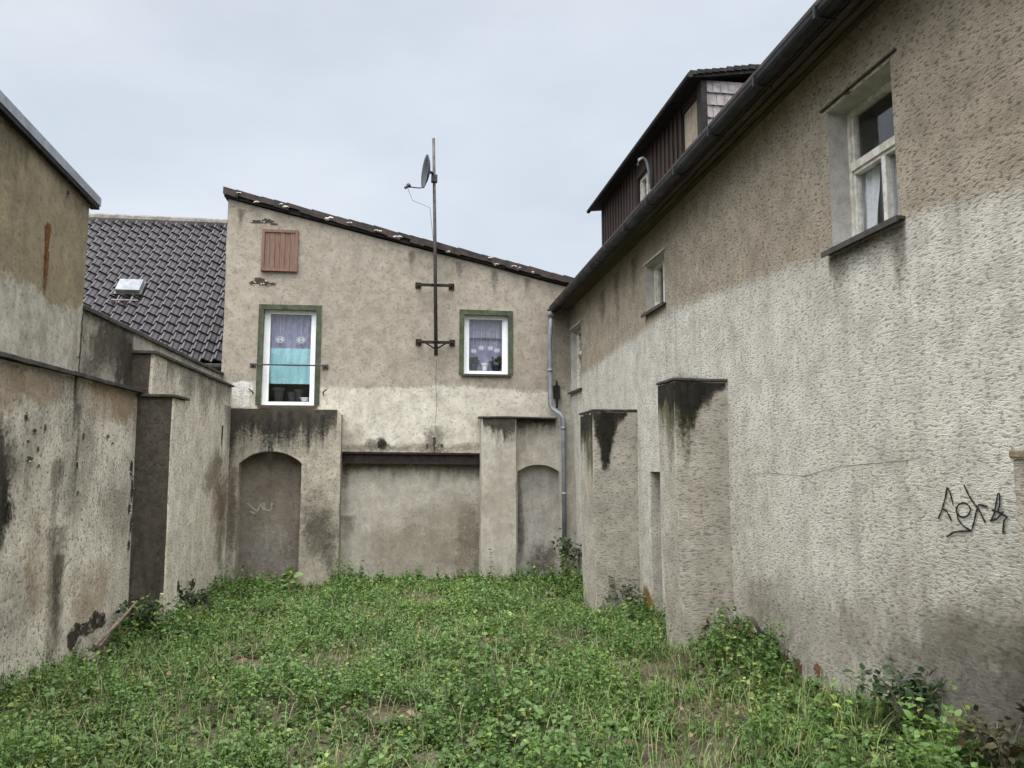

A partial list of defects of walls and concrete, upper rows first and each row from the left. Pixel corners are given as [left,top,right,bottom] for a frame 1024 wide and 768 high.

water stain [221,408,337,462]
water stain [580,411,627,473]
water stain [658,377,726,441]
water stain [0,429,15,546]
crack [753,458,918,498]
spalling [67,611,107,653]